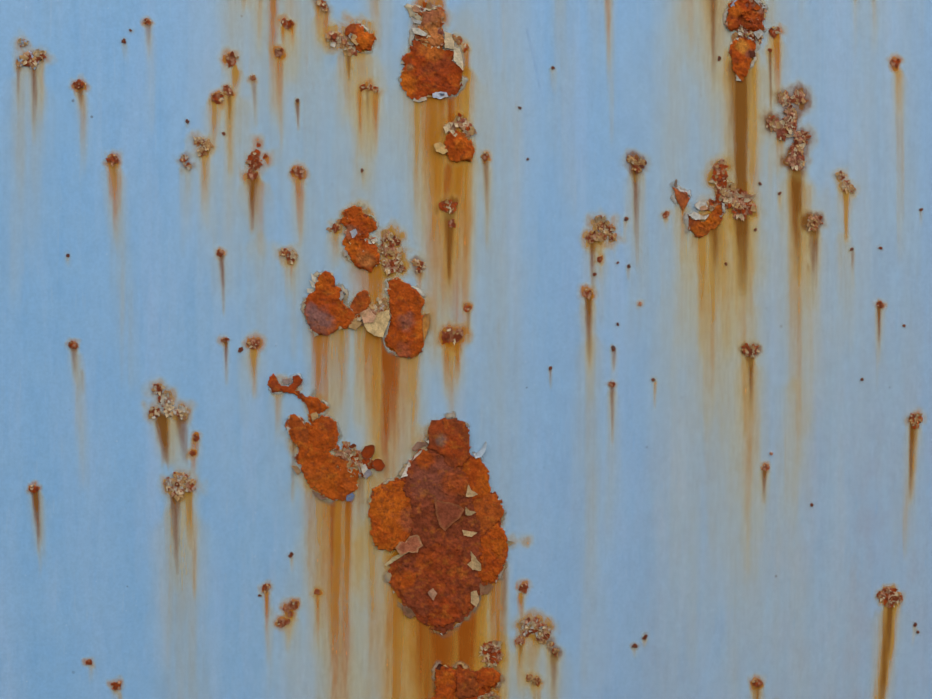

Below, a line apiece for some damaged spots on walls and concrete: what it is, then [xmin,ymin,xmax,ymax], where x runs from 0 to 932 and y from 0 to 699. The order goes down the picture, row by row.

rust [316,0,377,77]
rust [399,0,491,274]
rust [662,0,823,320]
rust [583,215,617,276]
rust [581,286,595,338]
rust [149,383,200,457]
rust [267,204,561,699]
rust [909,412,923,475]
rust [163,472,196,543]
rust [258,584,300,628]
rust [875,585,903,699]